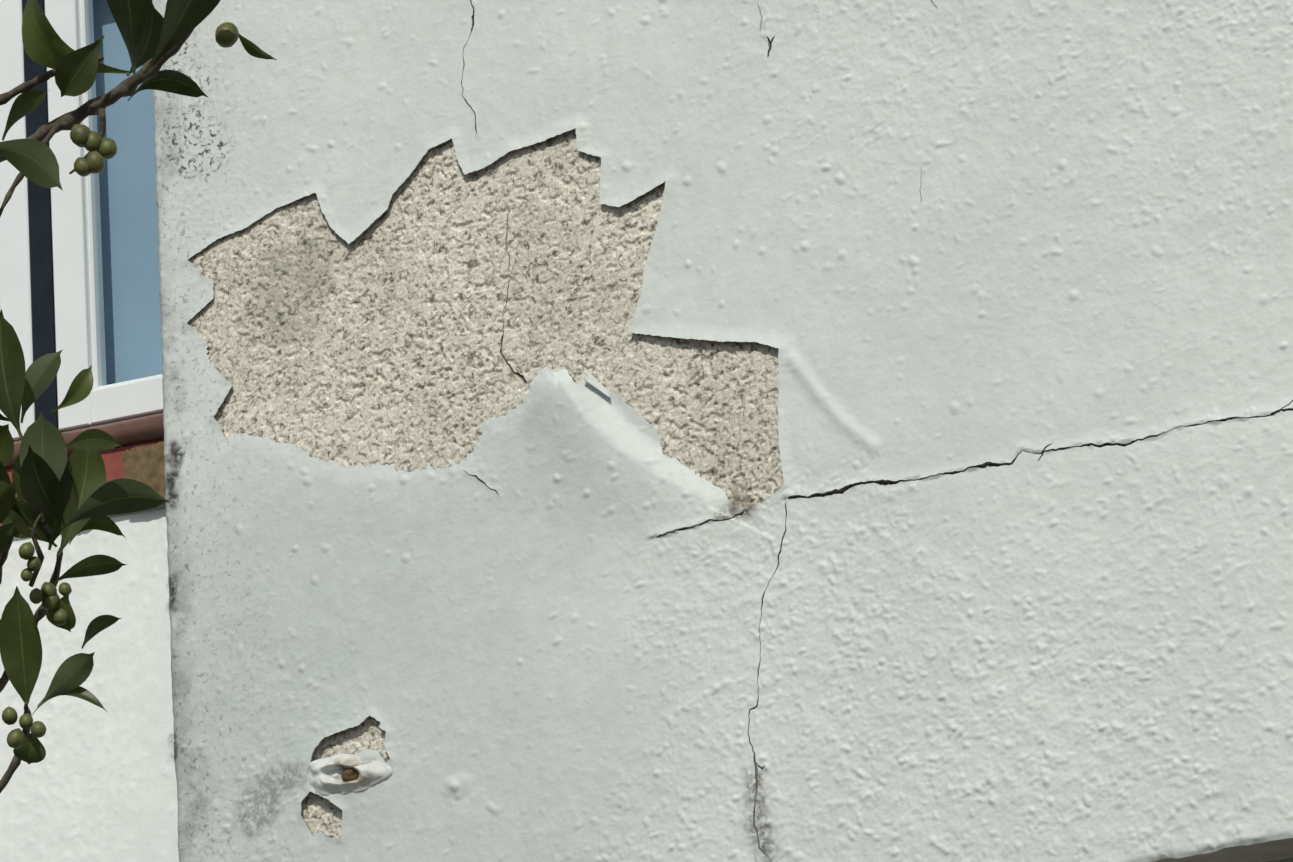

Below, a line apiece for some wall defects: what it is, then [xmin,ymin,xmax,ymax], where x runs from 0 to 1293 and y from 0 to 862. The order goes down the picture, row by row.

crack [461,0,477,134]
peeling [187,128,784,515]
crack [655,511,744,538]
crack [747,400,1293,860]
spalling [310,716,390,762]
spalling [301,791,343,838]